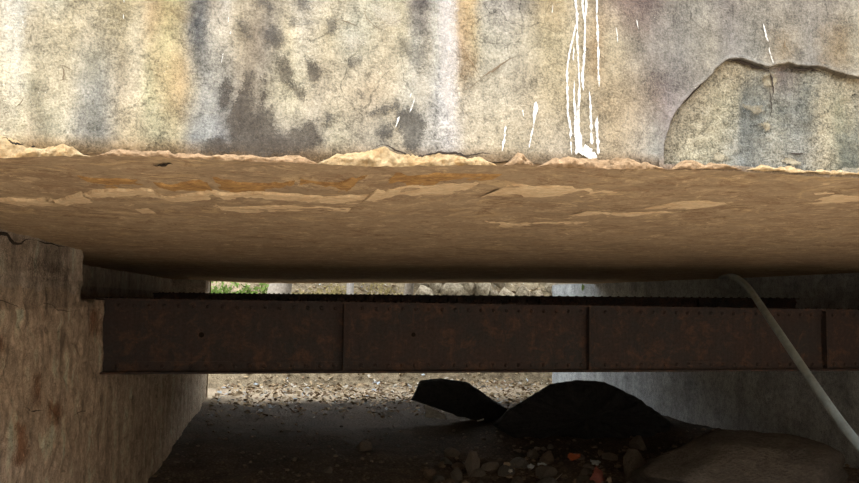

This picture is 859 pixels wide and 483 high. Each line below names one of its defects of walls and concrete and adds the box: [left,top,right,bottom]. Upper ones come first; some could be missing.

damp [201,55,333,157]
spalling [0,54,859,214]
damp [570,0,600,159]
crack [0,232,63,247]
peeling [485,200,726,227]